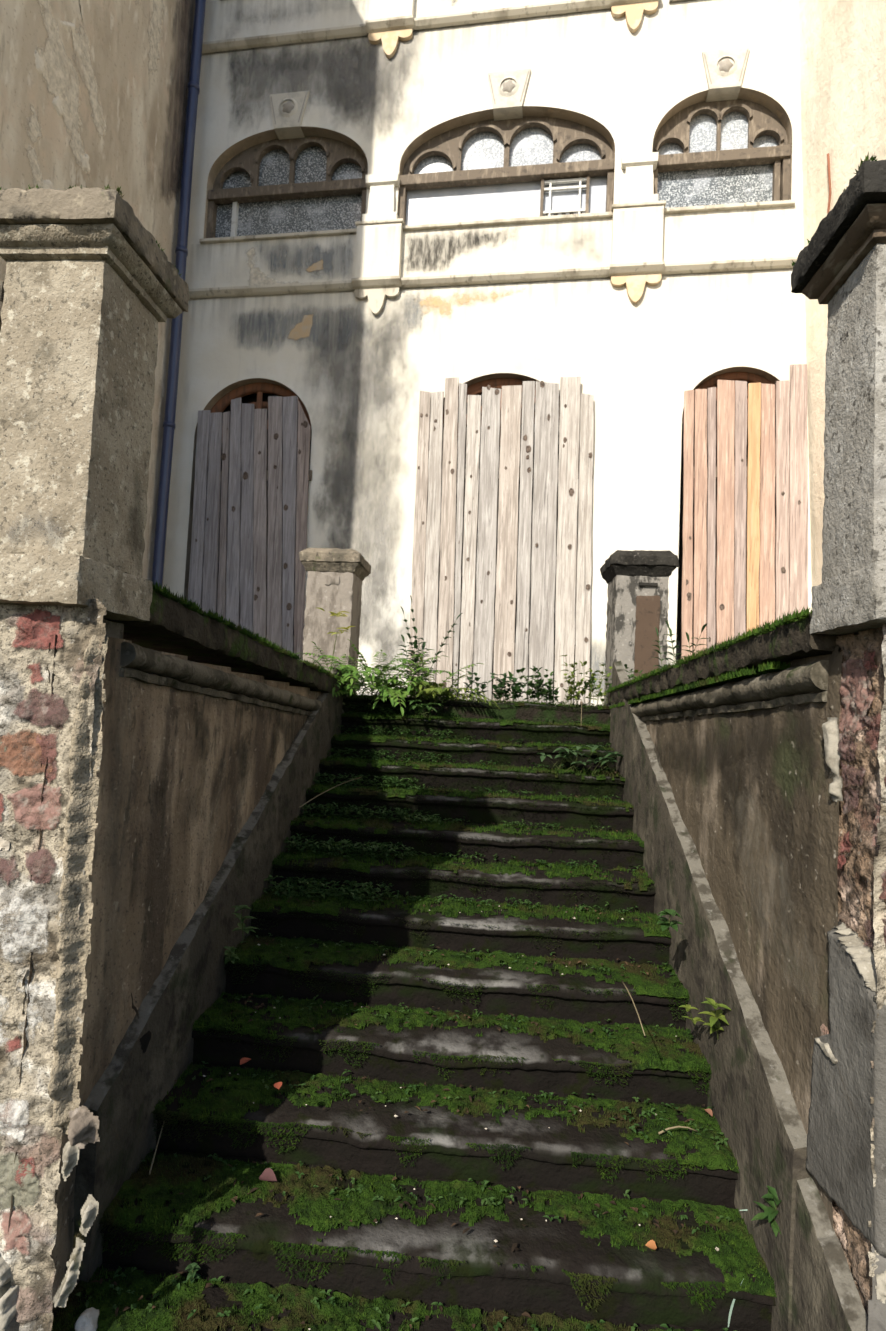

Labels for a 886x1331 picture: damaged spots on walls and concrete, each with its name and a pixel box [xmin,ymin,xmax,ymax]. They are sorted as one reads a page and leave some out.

leakage [231,39,411,130]
leakage [407,233,500,270]
peeling [287,314,313,340]
leakage [239,299,421,666]
spalling [822,623,886,1033]
spalling [0,599,107,1331]
peeling [814,1024,838,1064]
spalling [832,1199,880,1316]